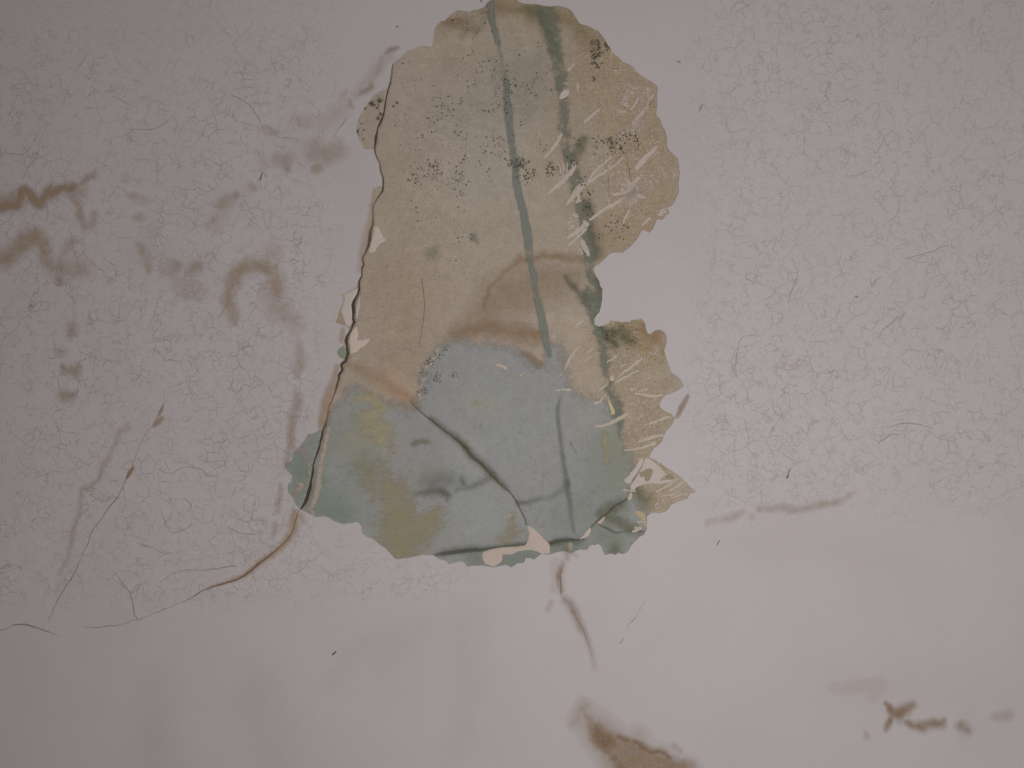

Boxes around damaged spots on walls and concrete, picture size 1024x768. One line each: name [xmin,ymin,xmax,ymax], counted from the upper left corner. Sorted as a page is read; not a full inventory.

damp [0,184,75,211]
damp [356,51,643,246]
peeling [285,0,695,567]
crack [435,423,527,525]
crack [13,466,133,628]
crack [443,548,485,556]
crack [549,537,576,545]